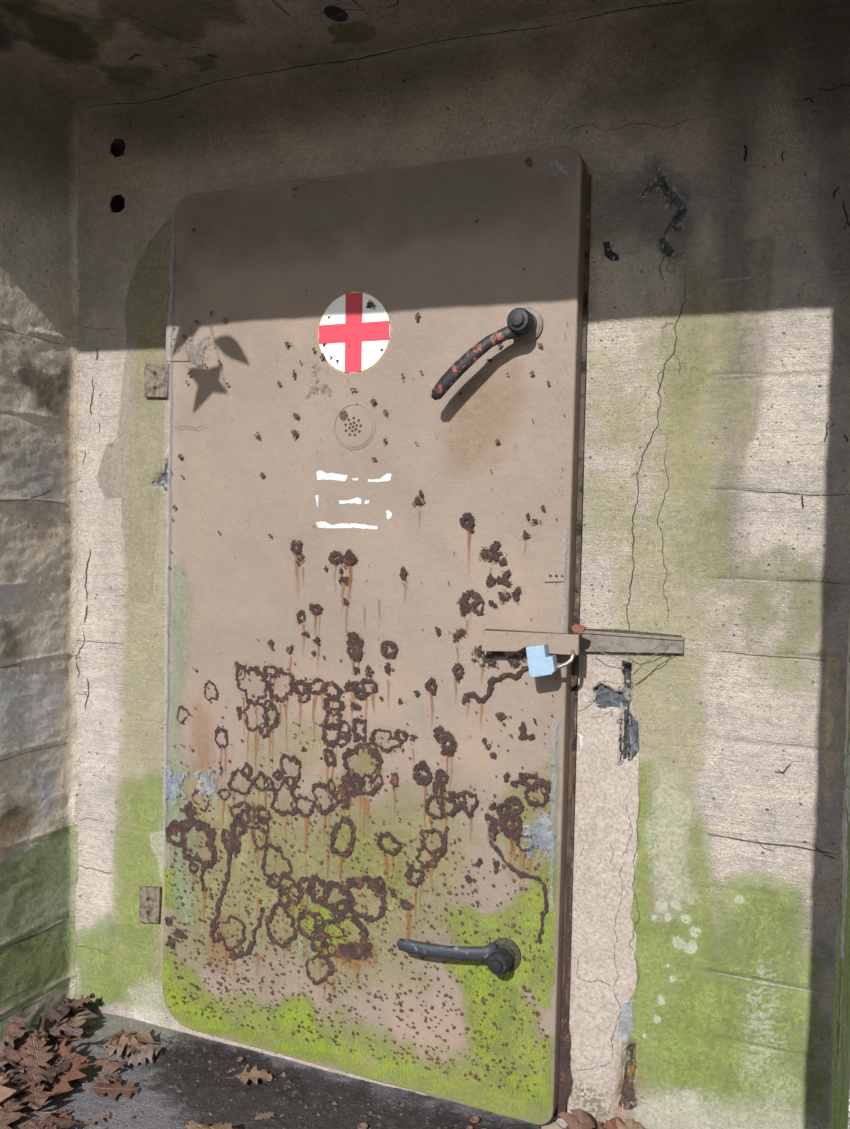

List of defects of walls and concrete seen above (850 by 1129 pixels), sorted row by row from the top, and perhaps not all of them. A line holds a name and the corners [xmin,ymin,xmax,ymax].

damp [0,0,93,59]
spalling [639,167,686,257]
crack [626,254,686,654]
corrosion [288,538,305,564]
corrosion [324,549,369,606]
corrosion [460,503,474,532]
corrosion [422,541,525,642]
corrosion [522,505,557,539]
spalling [589,659,639,765]
corrosion [164,603,574,1118]
damp [622,766,732,1087]